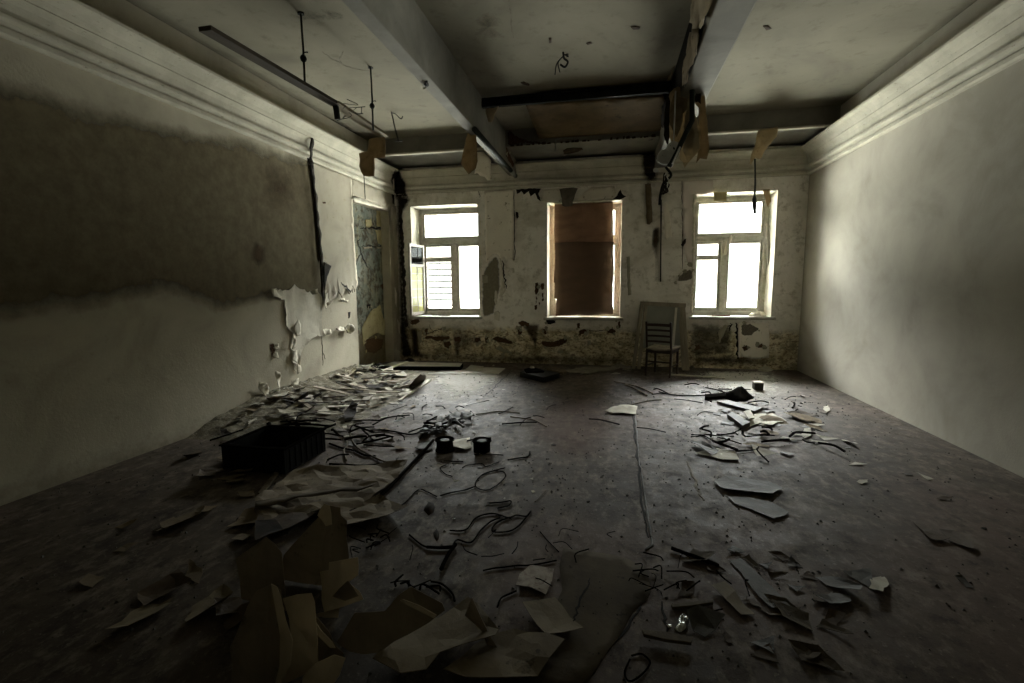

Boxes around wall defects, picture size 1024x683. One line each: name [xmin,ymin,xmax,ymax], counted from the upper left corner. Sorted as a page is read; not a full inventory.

water stain [0,88,324,313]
flaking render [482,258,500,321]
peeling [258,284,385,396]
flaking render [409,315,529,351]
flaking render [539,316,589,349]
peeling [718,321,770,359]